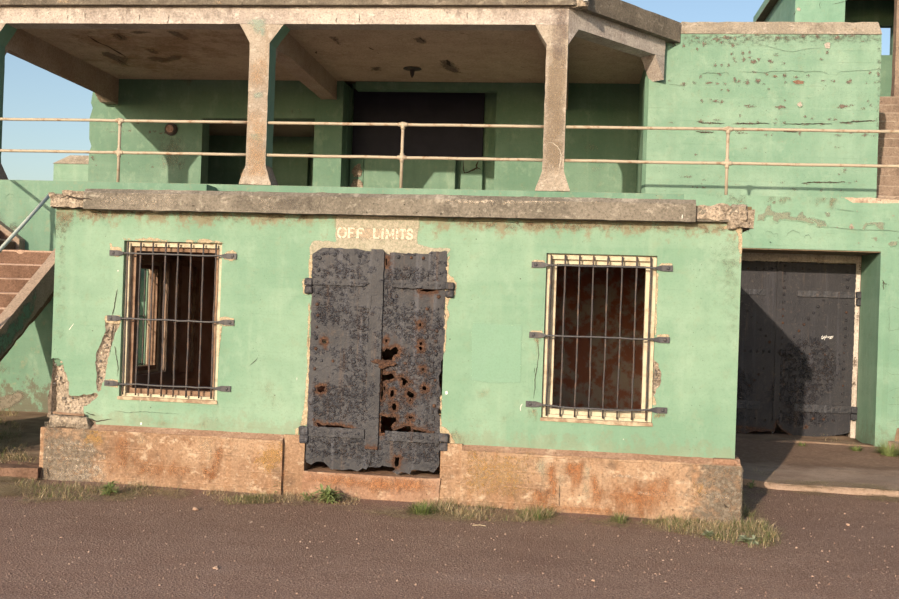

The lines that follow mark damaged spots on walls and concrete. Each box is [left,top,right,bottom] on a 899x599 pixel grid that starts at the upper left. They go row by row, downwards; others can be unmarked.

spalling [672,34,810,91]
spalling [804,169,899,203]
peeling [757,201,838,228]
peeling [723,226,742,264]
peeling [655,263,672,337]
spalling [47,315,121,429]
spalling [652,360,661,405]